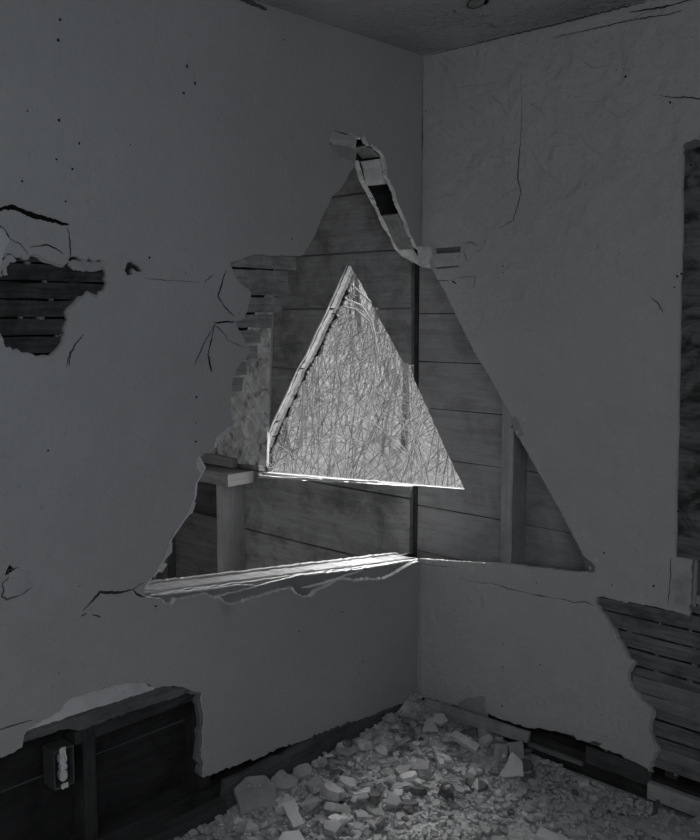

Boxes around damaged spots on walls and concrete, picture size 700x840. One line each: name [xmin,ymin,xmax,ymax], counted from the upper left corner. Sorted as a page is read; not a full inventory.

crack [422,1,646,68]
crack [660,93,700,101]
crack [498,80,522,229]
crack [0,204,71,256]
spalling [436,242,477,260]
spalling [0,254,107,357]
crack [144,272,244,372]
spalling [230,254,297,392]
spalling [144,428,228,590]
crack [82,583,145,618]
crack [419,563,594,606]
spalling [185,689,203,776]